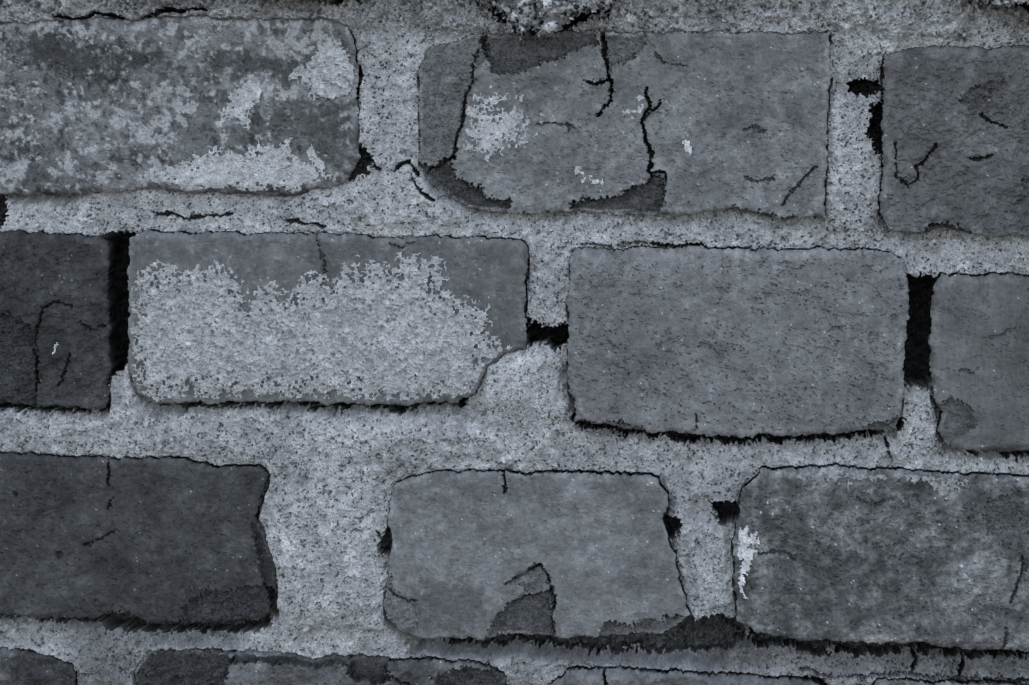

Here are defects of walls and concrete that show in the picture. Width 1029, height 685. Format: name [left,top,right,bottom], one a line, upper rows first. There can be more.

peeling [214,73,263,130]
peeling [149,137,339,193]
peeling [288,35,356,101]
spalling [421,34,647,209]
crack [536,35,614,132]
spalling [568,166,667,212]
crack [640,87,667,181]
crack [654,52,668,64]
peeling [130,252,512,402]
spalling [487,562,556,635]
peeling [737,525,760,599]
spalling [136,653,391,685]